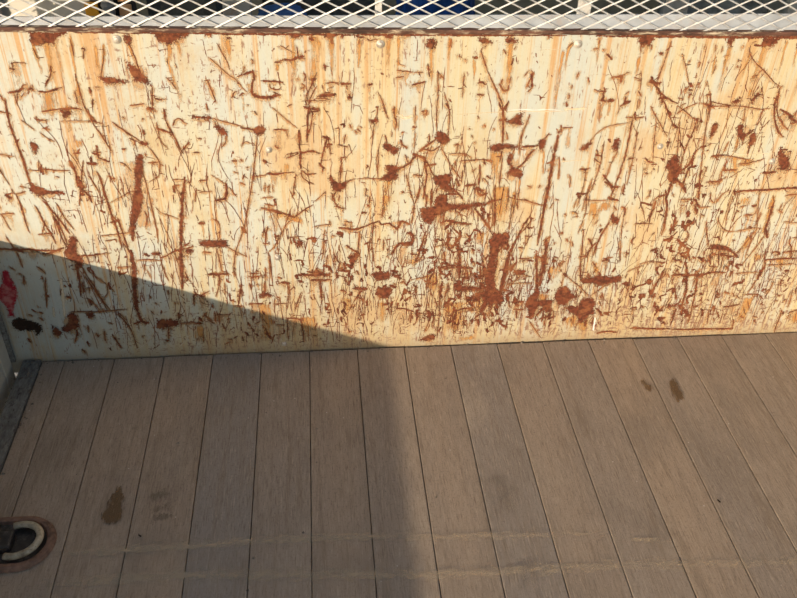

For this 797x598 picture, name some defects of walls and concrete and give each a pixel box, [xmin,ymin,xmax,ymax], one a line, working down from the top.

rust [4,31,797,354]
water stain [669,379,683,402]
water stain [101,486,124,525]